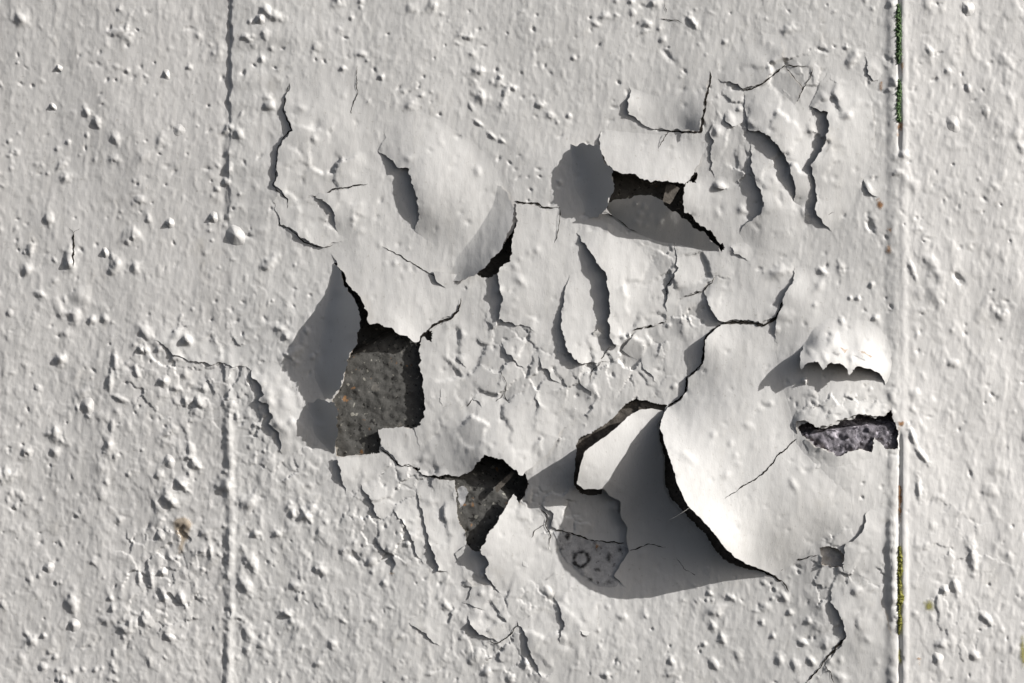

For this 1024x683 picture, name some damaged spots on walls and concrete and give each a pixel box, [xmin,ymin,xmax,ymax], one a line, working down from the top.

peeling [155,33,901,683]
crack [806,637,846,683]